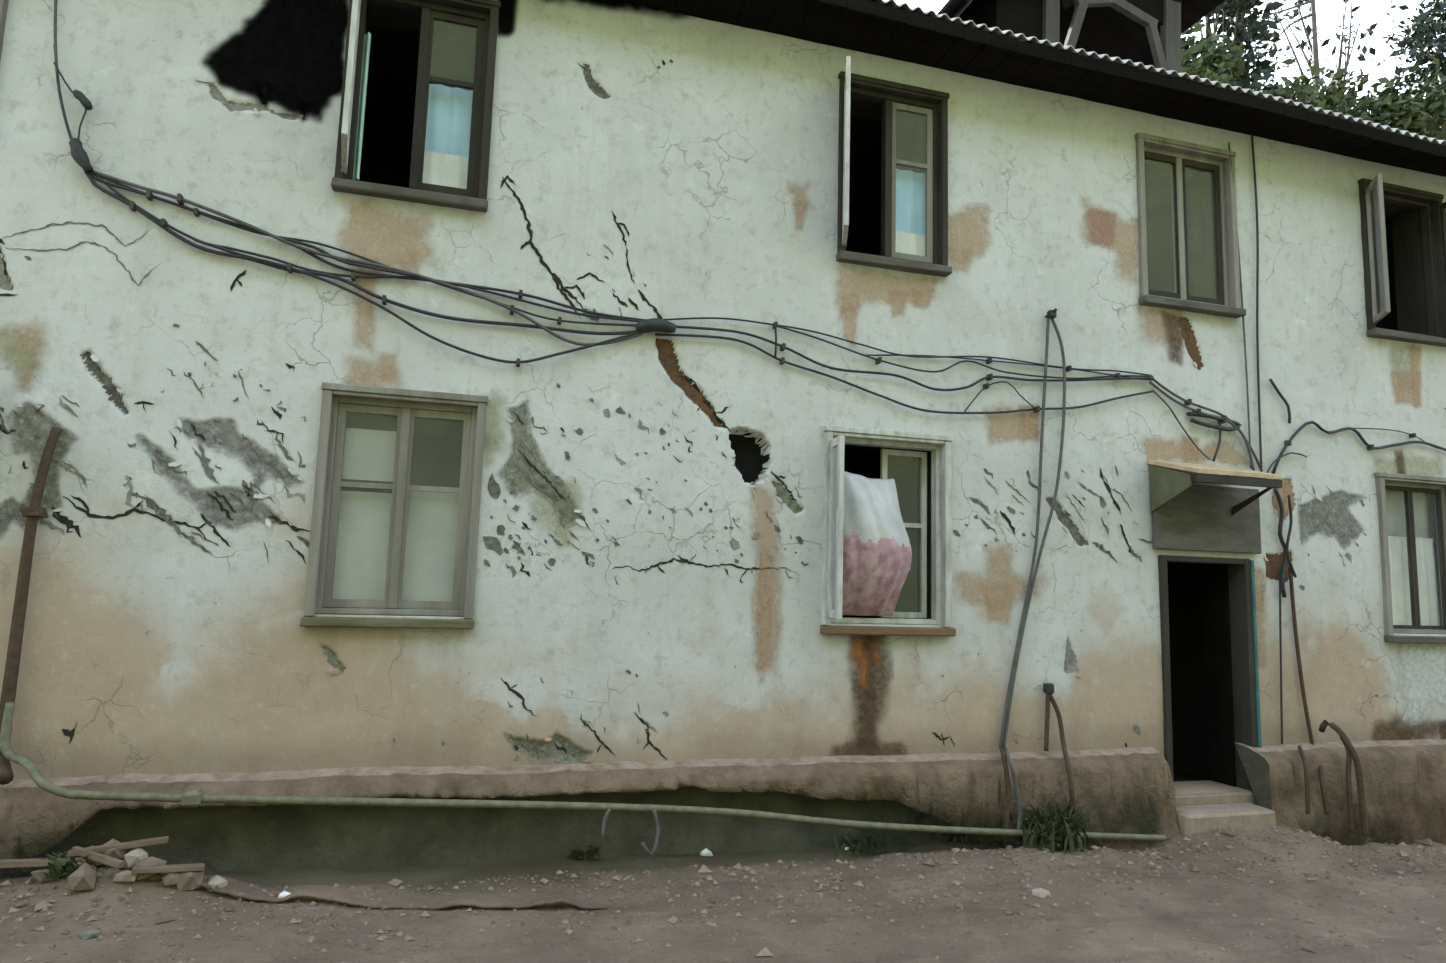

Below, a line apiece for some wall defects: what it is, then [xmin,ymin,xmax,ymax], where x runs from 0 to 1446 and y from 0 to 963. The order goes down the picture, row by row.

crack [0,221,161,296]
crack [500,175,662,319]
spalling [80,351,128,414]
spalling [123,384,311,564]
spalling [483,404,620,577]
spalling [589,398,695,466]
spalling [626,478,713,528]
crack [612,555,796,578]
spalling [655,332,809,583]
corrosion [1145,313,1182,363]
spalling [1264,474,1377,590]
damp [833,635,906,756]